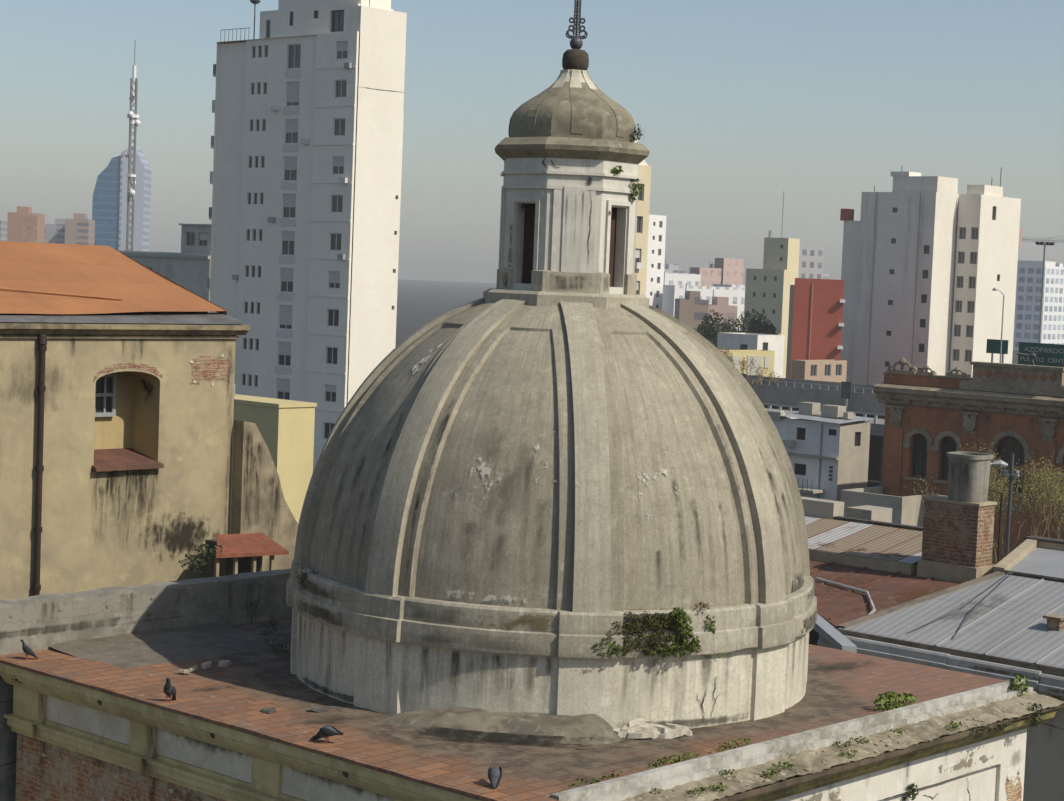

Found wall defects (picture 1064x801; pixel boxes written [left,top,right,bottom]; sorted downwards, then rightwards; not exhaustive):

spalling [189,354,235,387]
water stain [99,469,158,506]
peeling [455,457,501,502]
crack [696,679,720,718]
spalling [1006,768,1022,801]